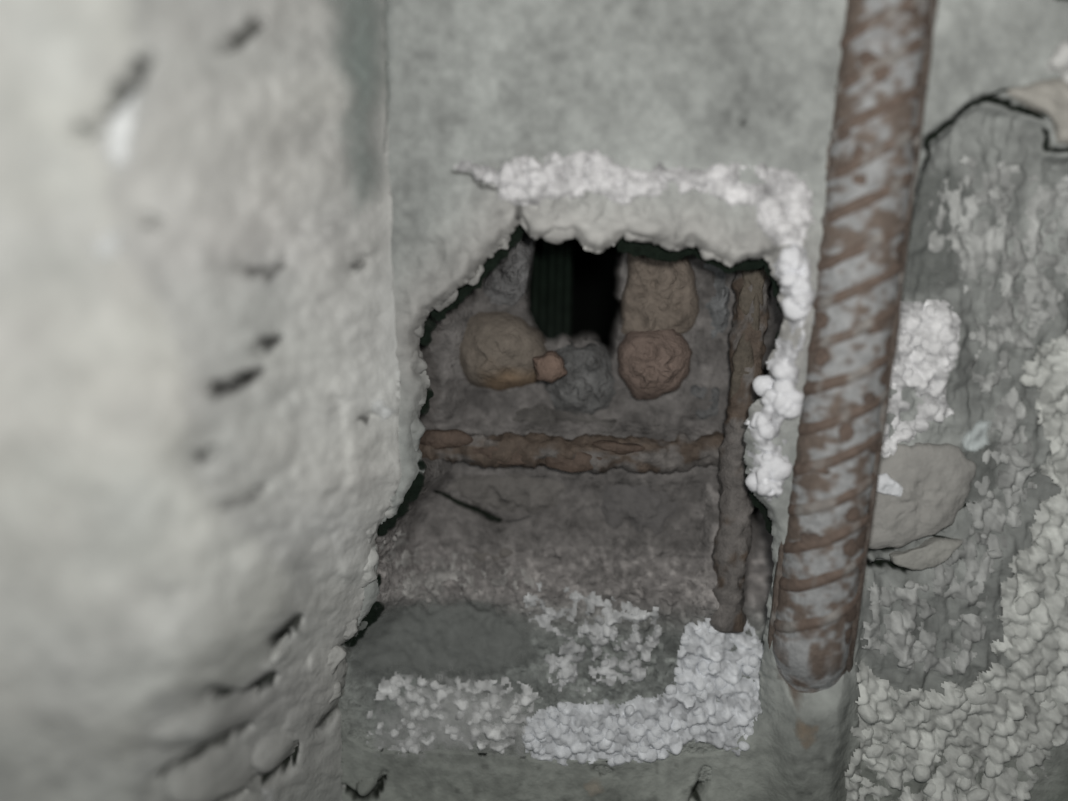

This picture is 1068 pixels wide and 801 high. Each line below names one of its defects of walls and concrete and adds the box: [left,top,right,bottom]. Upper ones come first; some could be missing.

corrosion [858,50,890,83]
crack [909,88,1068,237]
spalling [519,190,607,244]
spalling [434,265,485,312]
damp [453,149,815,502]
corrosion [815,311,829,330]
corrosion [863,325,892,403]
damp [844,155,1068,801]
spalling [360,494,404,588]
crack [866,547,908,572]
spalling [321,619,358,723]
damp [354,530,764,767]